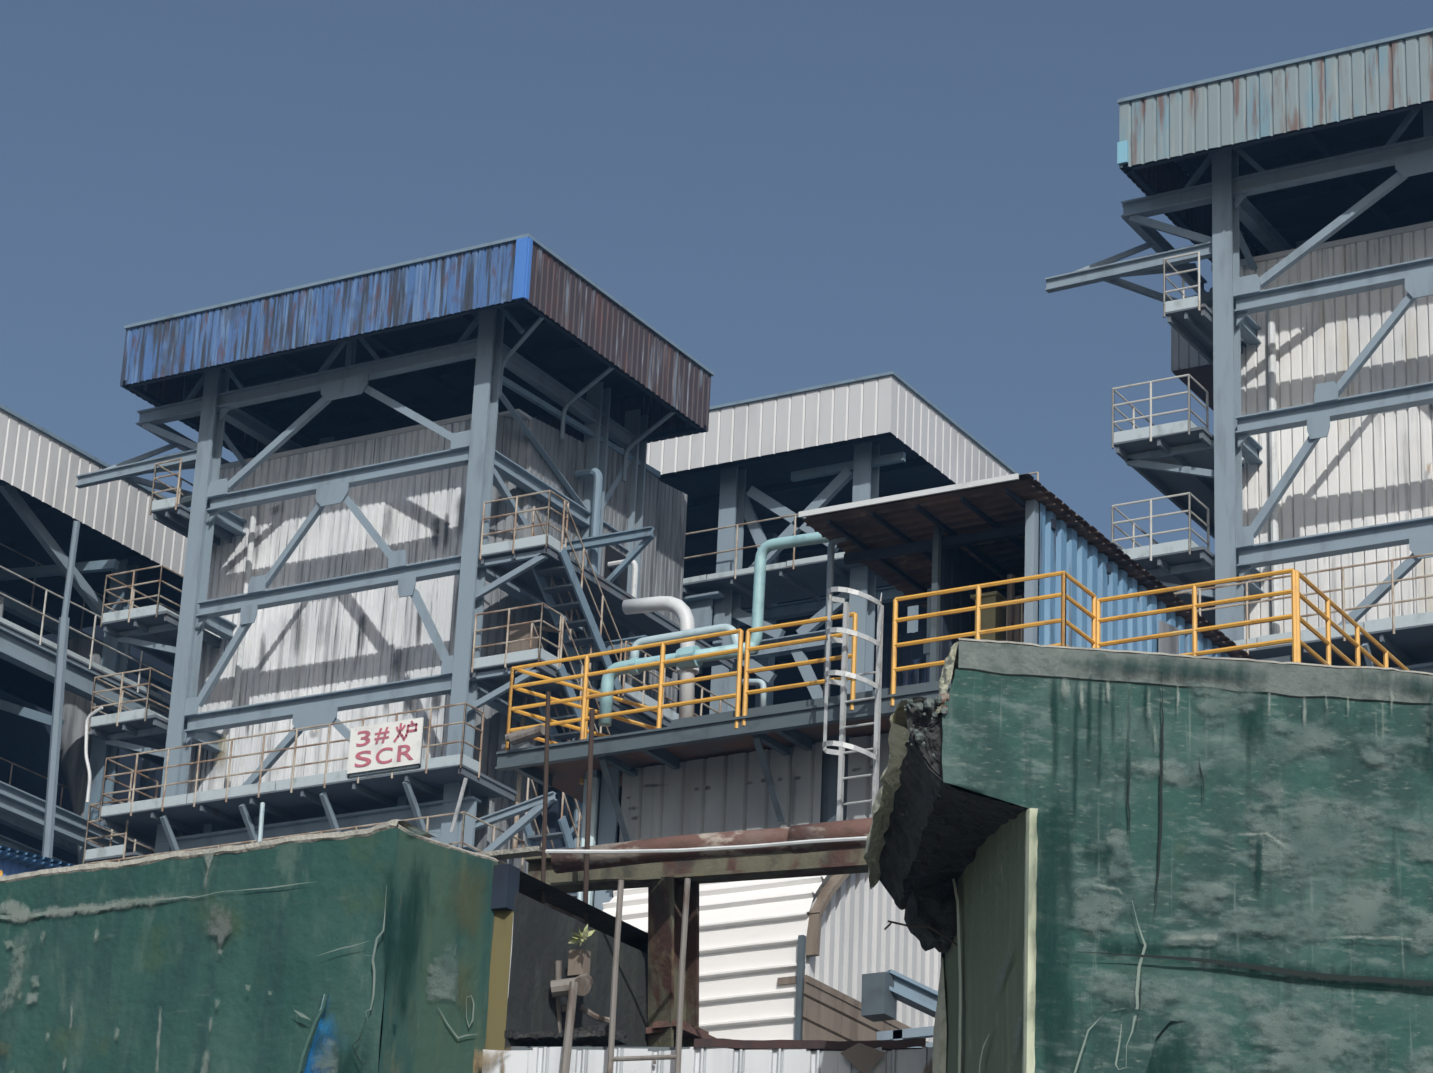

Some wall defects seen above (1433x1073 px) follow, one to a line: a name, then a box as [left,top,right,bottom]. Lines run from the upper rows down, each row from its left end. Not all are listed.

leakage [432,515,448,546]
leakage [1123,658,1251,715]
spalling [879,641,959,909]
leakage [1036,662,1130,1067]
crack [0,882,311,921]